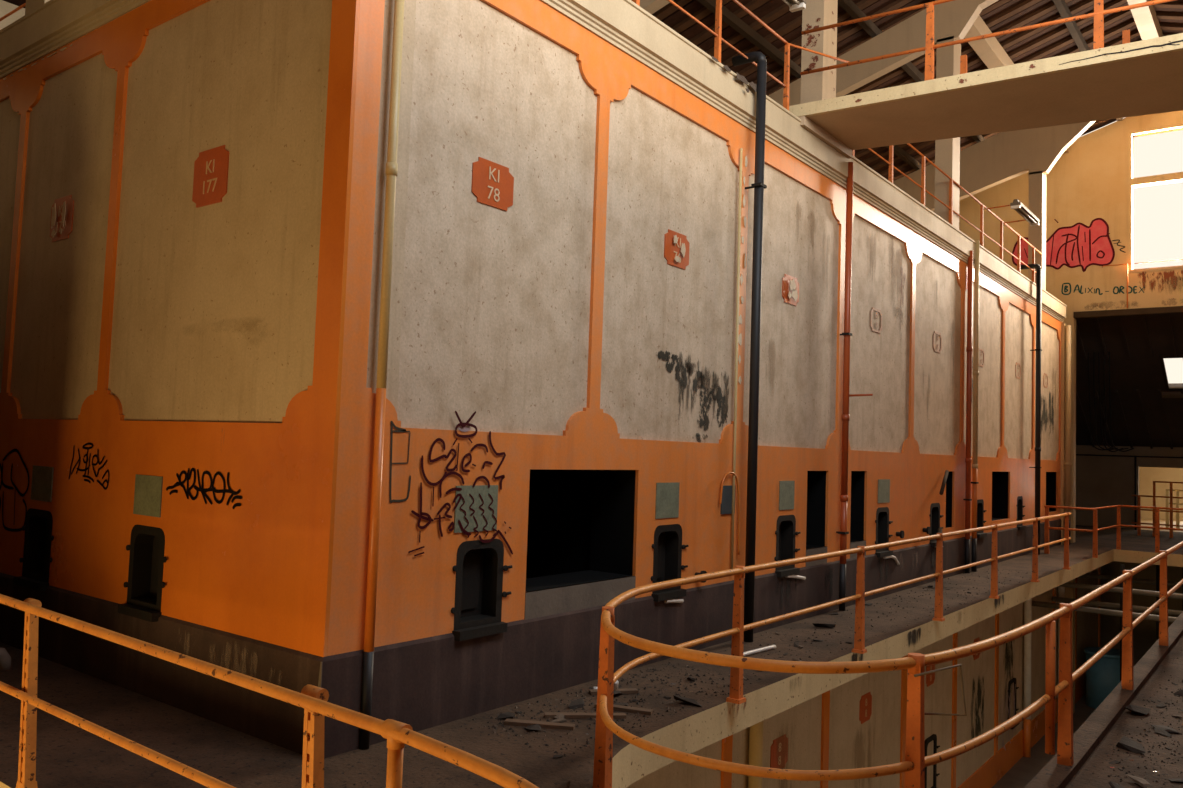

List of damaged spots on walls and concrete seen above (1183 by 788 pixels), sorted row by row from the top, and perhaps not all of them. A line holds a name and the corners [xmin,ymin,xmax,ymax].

damp [656,351,729,443]